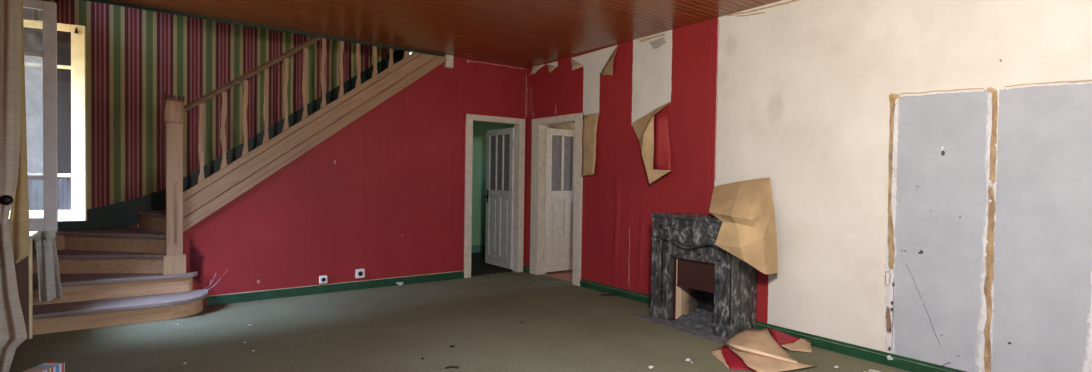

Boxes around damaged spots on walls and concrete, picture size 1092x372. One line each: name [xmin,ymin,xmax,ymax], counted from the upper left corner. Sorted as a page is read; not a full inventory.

flaking render [571,45,618,115]
flaking render [631,30,672,126]